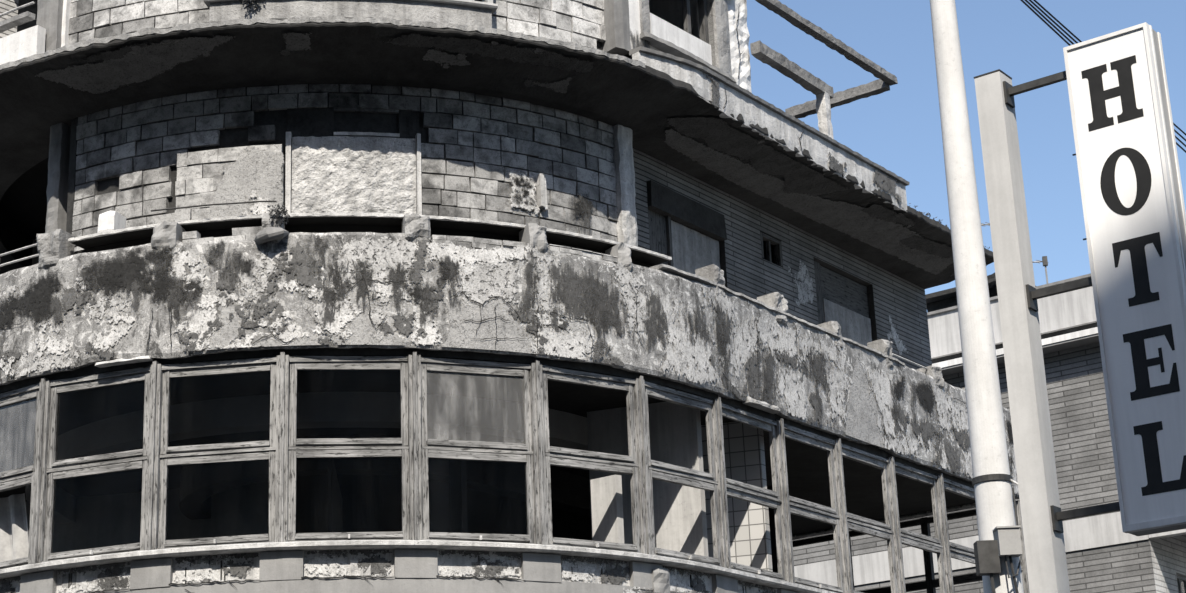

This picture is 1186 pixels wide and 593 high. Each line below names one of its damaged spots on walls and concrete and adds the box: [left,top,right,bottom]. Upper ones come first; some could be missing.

flaking render [707,74,721,109]
flaking render [664,128,955,277]
water stain [0,269,65,330]
peeling [0,264,154,377]
water stain [79,245,202,331]
water stain [314,235,374,328]
flaking render [170,234,624,366]
water stain [388,255,461,324]
crack [450,291,593,356]
water stain [519,251,668,351]
peeling [612,260,973,478]
water stain [891,376,935,422]